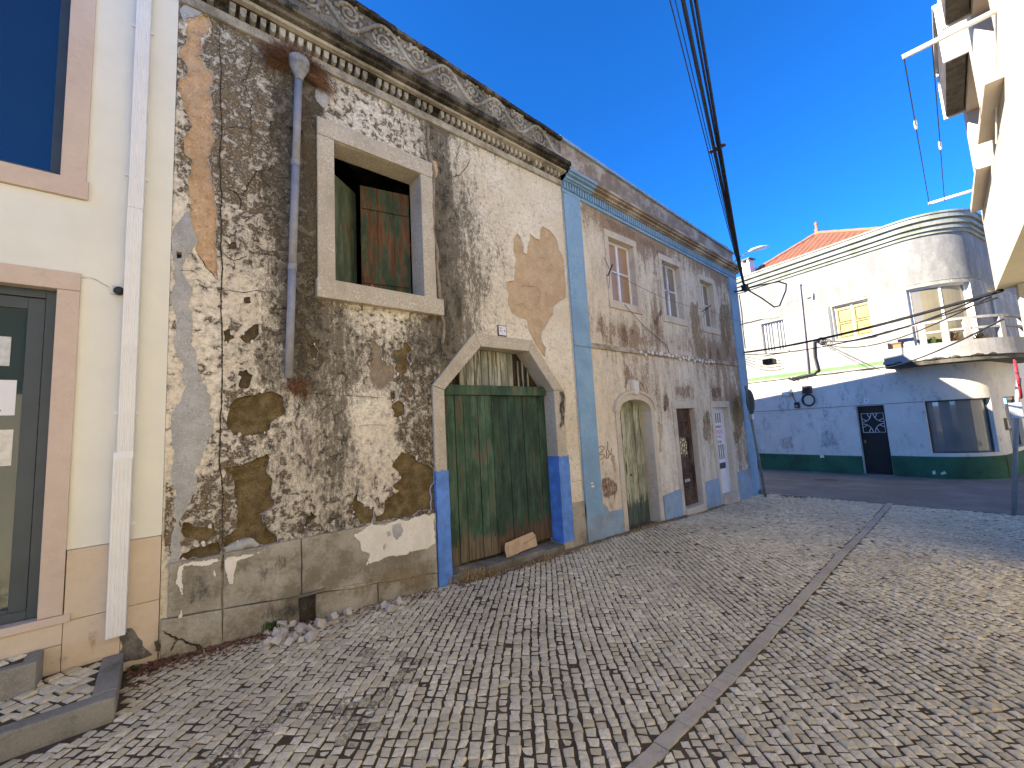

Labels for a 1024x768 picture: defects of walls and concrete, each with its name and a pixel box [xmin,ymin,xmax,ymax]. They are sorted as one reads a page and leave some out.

flaking render [178,14,237,279]
leakage [435,190,447,268]
crack [182,25,277,557]
leakage [436,288,461,358]
flaking render [506,226,566,356]
leakage [690,303,731,360]
flaking render [227,369,287,437]
leakage [733,393,744,443]
flaking render [176,453,278,595]
flaking render [352,451,436,566]
leakage [602,478,617,498]
peeling [119,628,161,663]